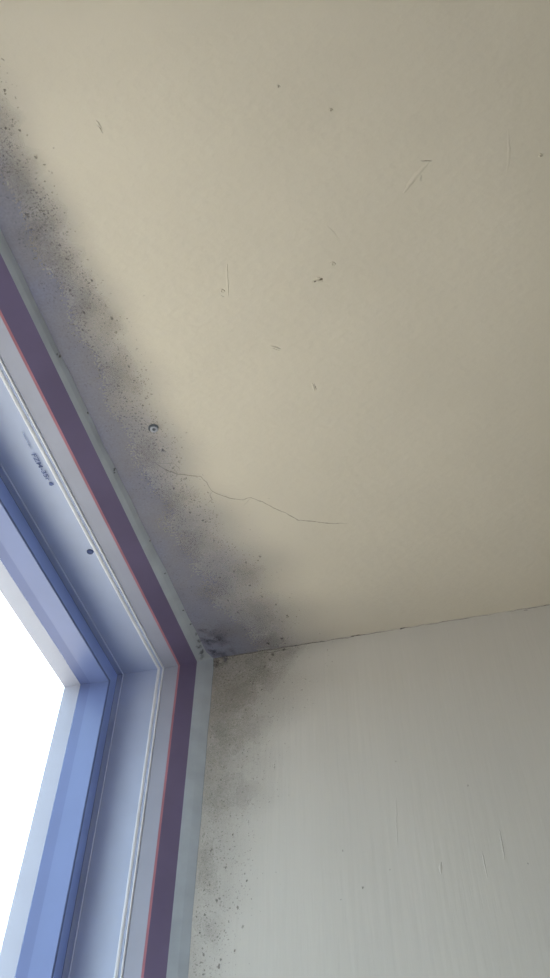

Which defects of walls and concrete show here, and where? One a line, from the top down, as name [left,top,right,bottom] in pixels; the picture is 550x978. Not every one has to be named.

water stain [0,149,285,711]